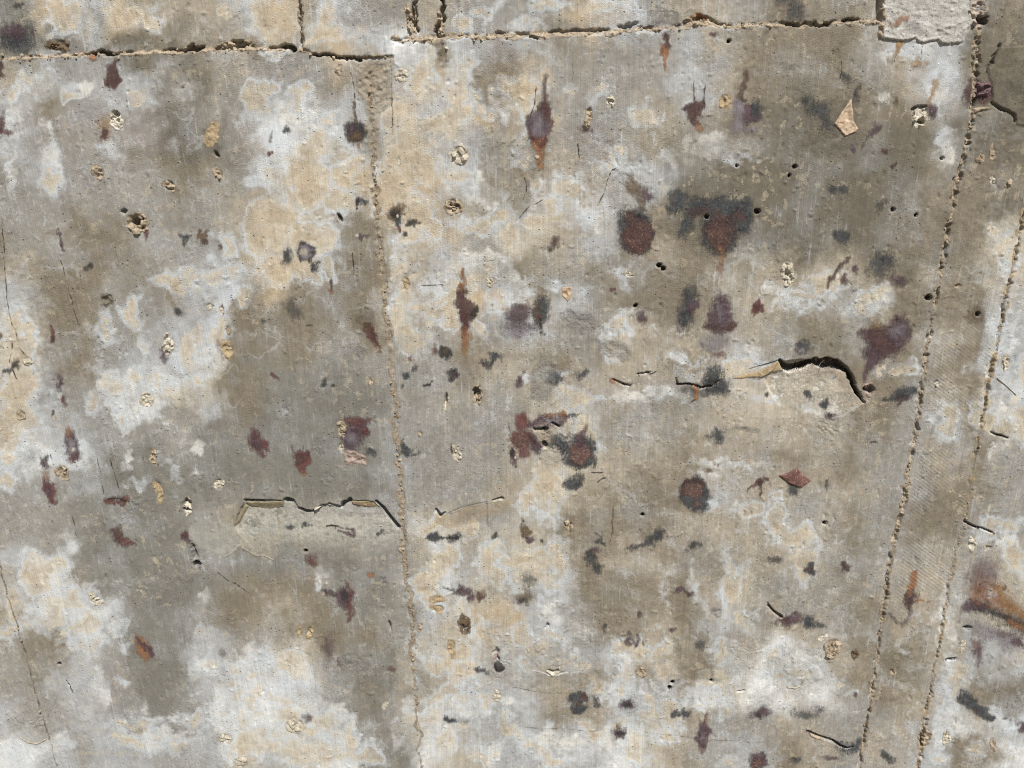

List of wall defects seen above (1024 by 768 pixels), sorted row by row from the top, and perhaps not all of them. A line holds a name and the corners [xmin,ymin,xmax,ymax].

corrosion [526,76,553,169]
corrosion [683,85,706,131]
spalling [835,100,858,136]
spalling [127,212,149,237]
corrosion [455,268,479,349]
corrosion [857,316,912,380]
corrosion [341,417,376,455]
corrosion [509,410,576,458]